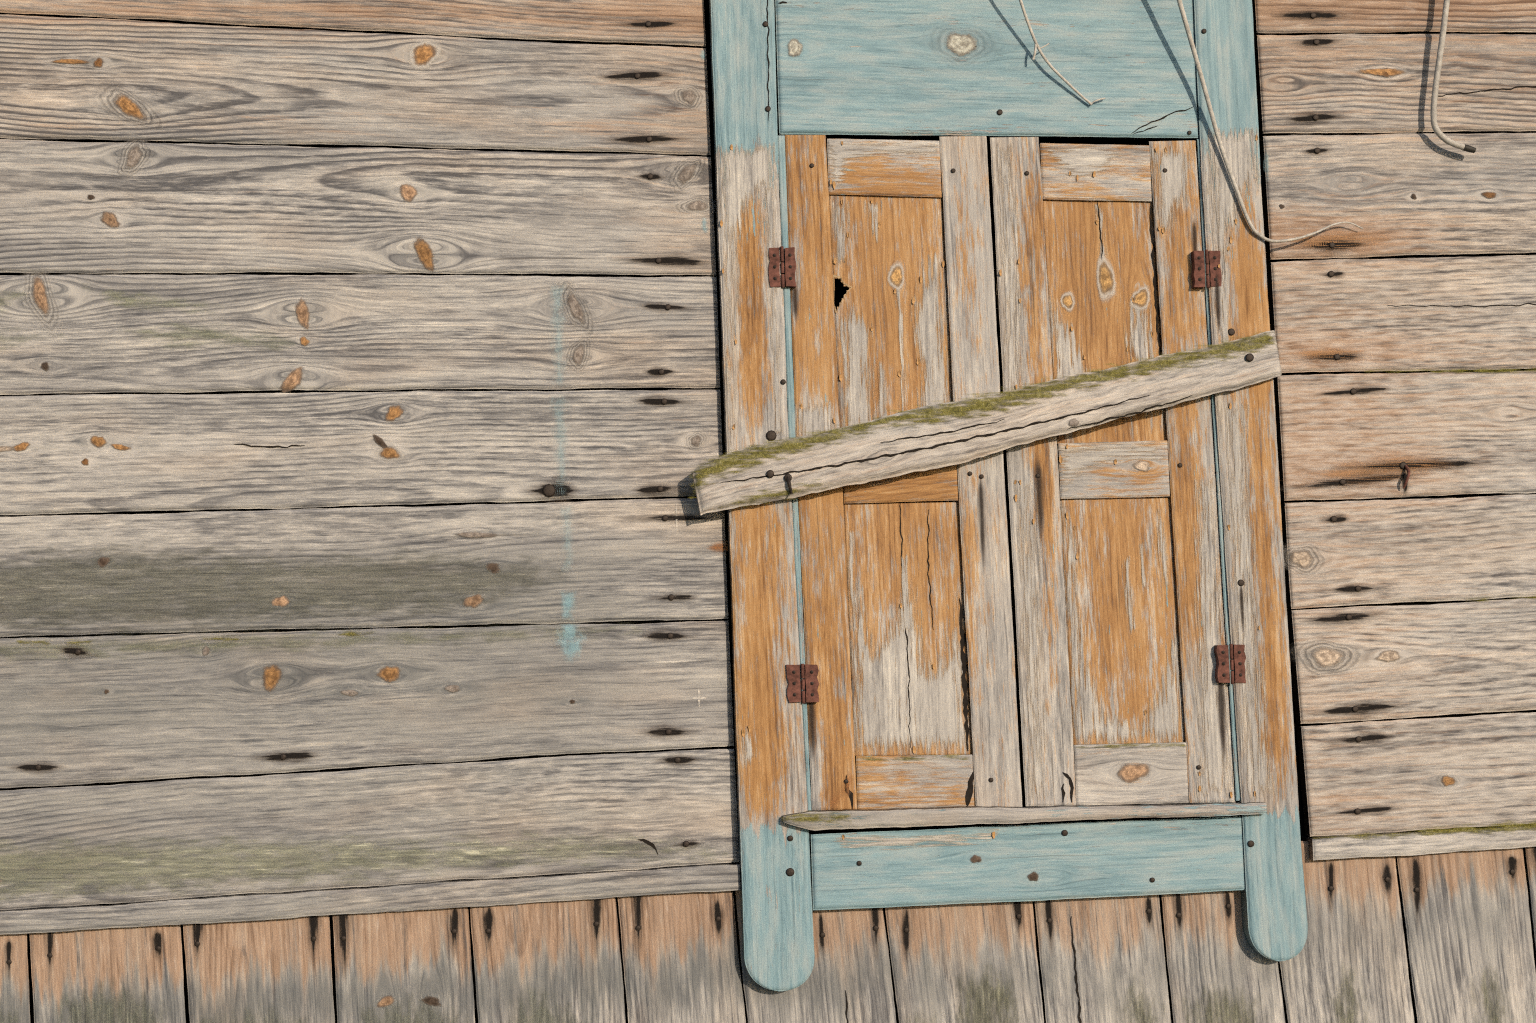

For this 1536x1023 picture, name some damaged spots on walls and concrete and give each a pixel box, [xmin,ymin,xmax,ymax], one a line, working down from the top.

peeling [1152,128,1259,342]
peeling [719,144,777,444]
peeling [770,141,951,437]
peeling [1059,403,1273,798]
peeling [848,531,966,755]
peeling [965,772,974,806]
leakage [192,923,203,952]
leakage [309,916,318,956]
leakage [339,914,349,964]
leakage [484,907,493,940]
leakage [592,899,601,940]
leakage [634,896,642,941]